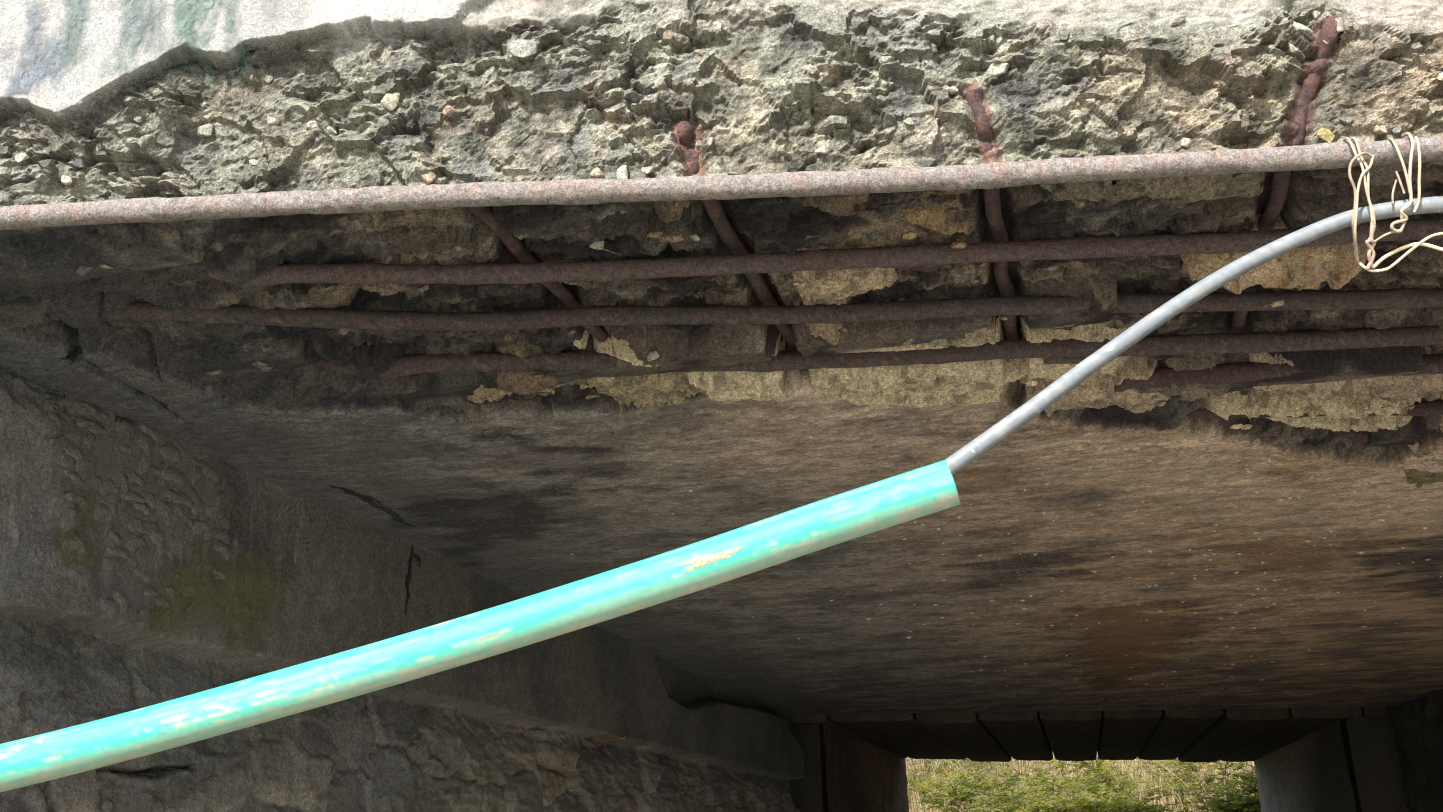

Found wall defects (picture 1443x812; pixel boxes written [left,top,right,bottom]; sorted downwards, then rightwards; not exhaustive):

spalling [0,0,1443,207]
rust [964,83,1000,164]
rust [1283,20,1345,147]
spalling [0,161,1443,488]
crack [331,486,421,614]